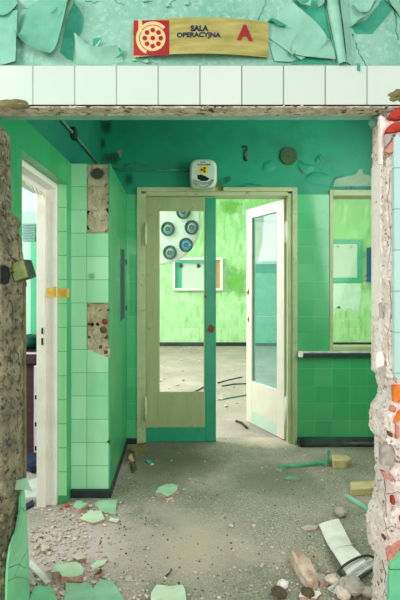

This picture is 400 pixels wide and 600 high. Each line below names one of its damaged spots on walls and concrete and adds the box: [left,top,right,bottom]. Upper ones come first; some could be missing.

peeling [0,0,124,65]
peeling [268,0,392,71]
spalling [0,105,400,439]
leakage [229,272,245,294]
spalling [4,281,27,478]
spalling [379,443,400,600]